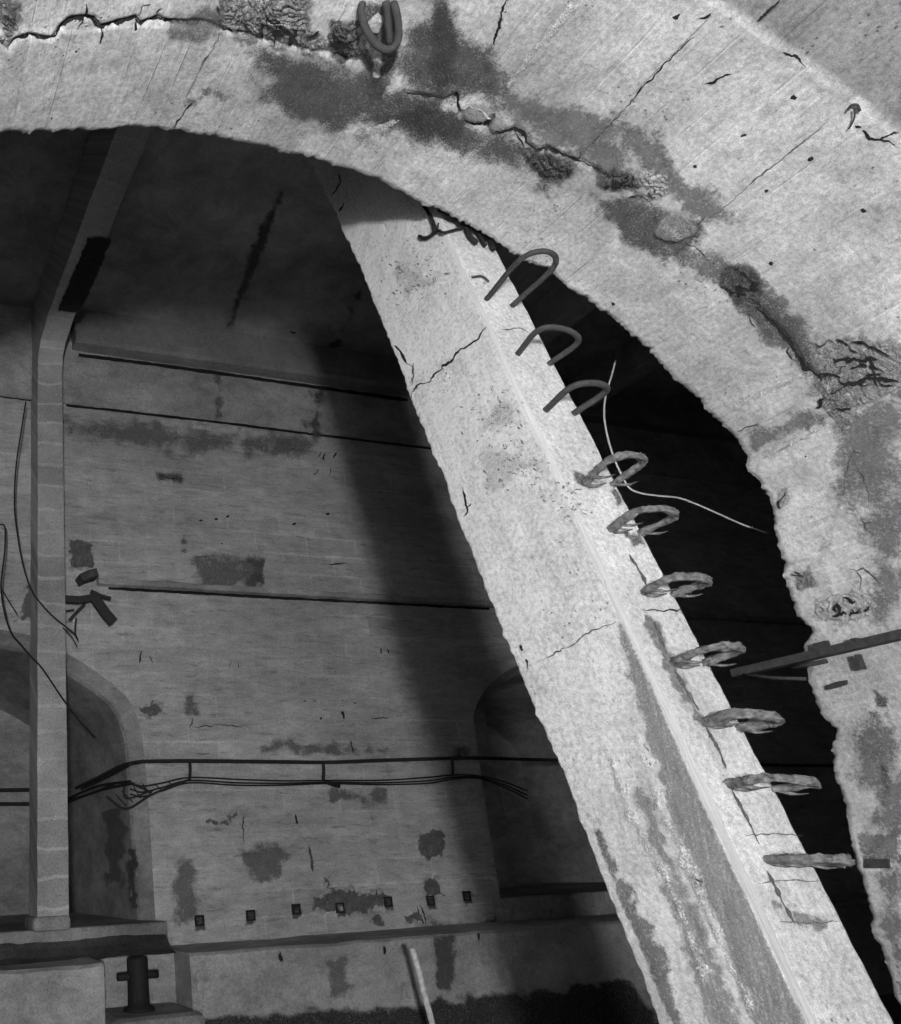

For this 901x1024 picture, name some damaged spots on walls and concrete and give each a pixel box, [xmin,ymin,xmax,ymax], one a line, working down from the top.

crack [1,4,241,128]
spalling [219,0,362,64]
crack [403,13,711,176]
crack [855,125,899,145]
crack [394,328,528,400]
damp [169,0,901,622]
crack [748,307,899,387]
spalling [810,333,901,432]
spalling [792,566,878,627]
damp [611,615,804,1024]
damp [173,860,196,921]
damp [205,830,680,1024]